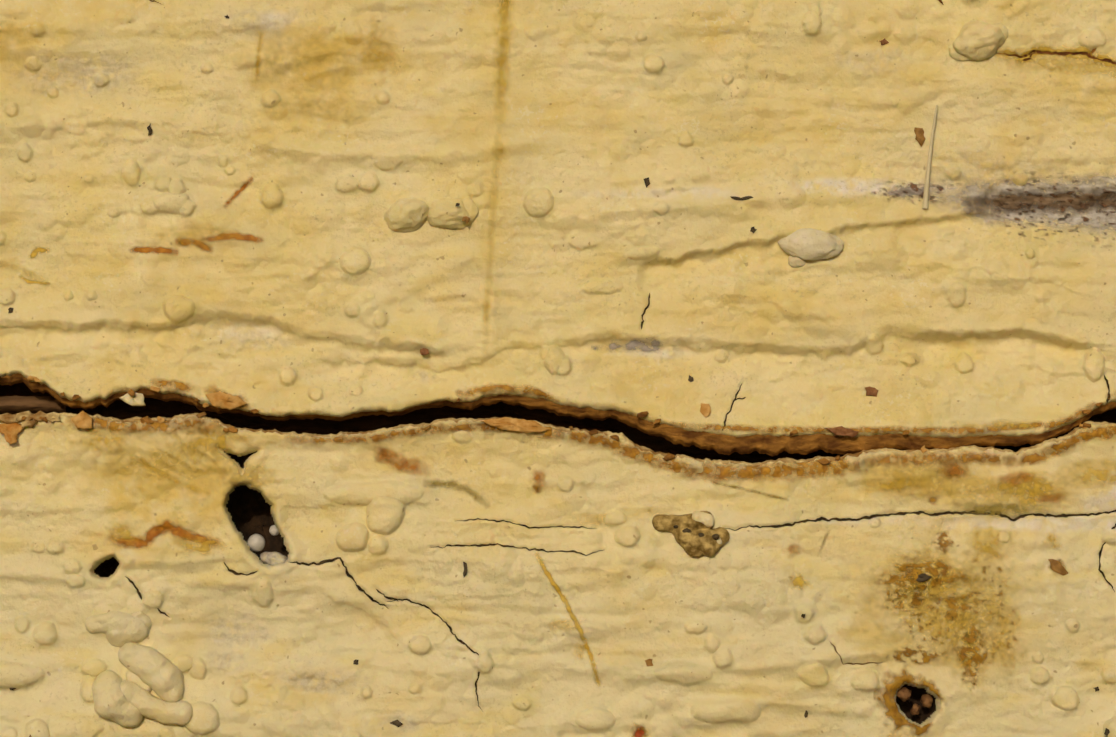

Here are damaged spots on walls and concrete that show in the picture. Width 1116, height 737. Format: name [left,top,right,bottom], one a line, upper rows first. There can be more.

crack [997,47,1116,66]
crack [641,293,650,329]
crack [0,373,1116,480]
crack [224,562,257,576]
crack [430,518,603,556]
crack [725,510,1116,592]
crack [290,557,482,710]
crack [830,642,882,665]